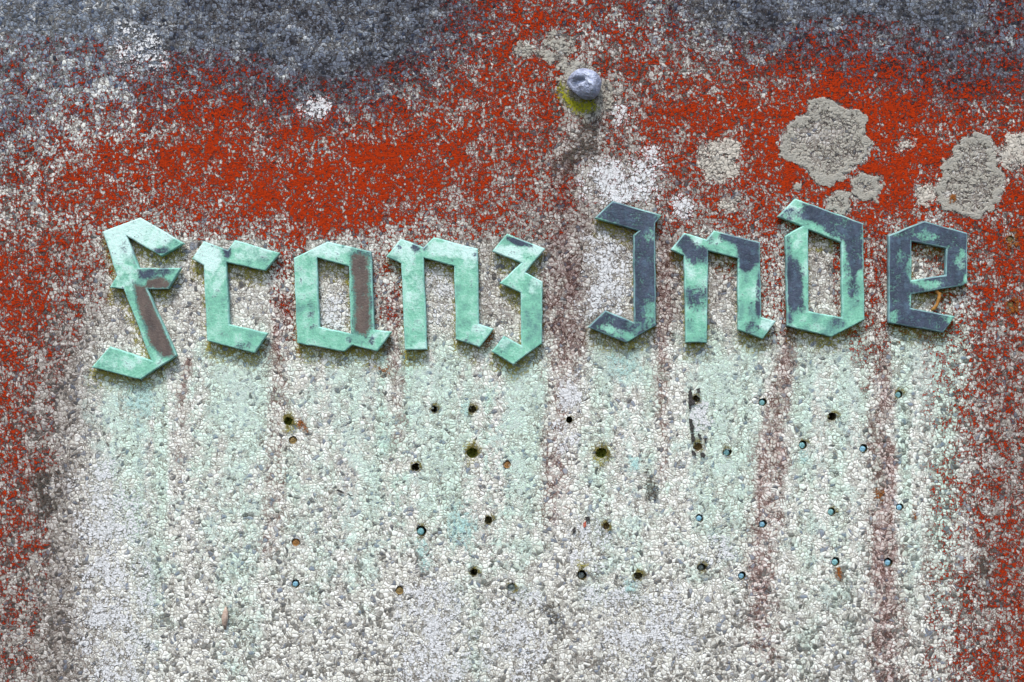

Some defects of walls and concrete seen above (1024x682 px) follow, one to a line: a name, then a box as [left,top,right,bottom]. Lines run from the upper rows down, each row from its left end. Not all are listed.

leakage [911,242,944,279]
leakage [911,286,965,308]
leakage [888,321,952,427]
leakage [566,220,869,682]